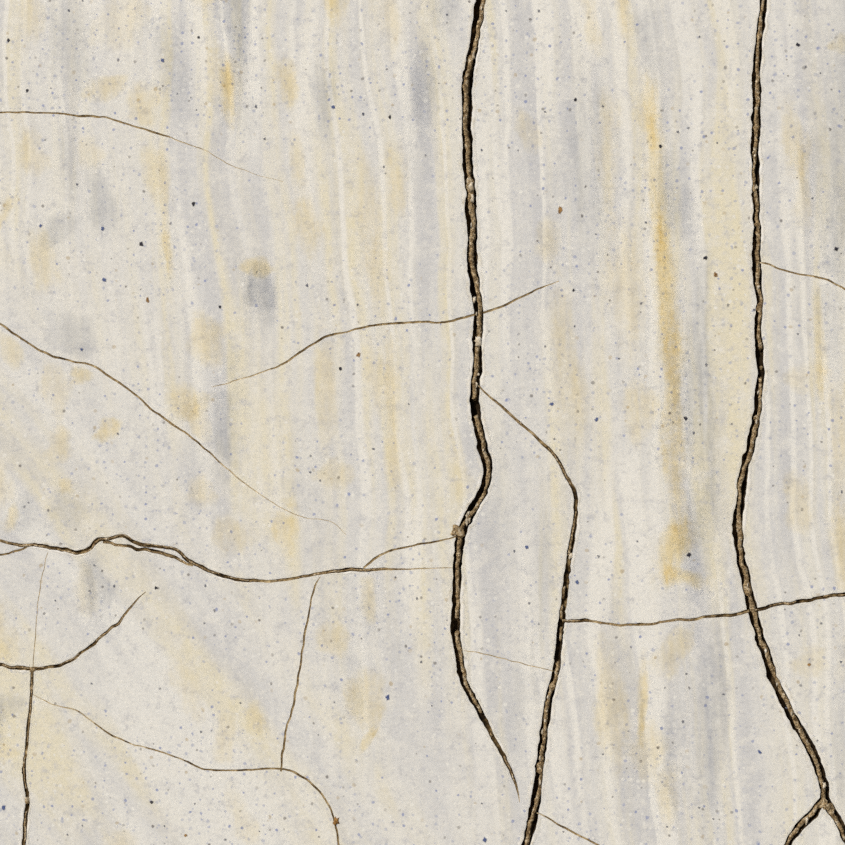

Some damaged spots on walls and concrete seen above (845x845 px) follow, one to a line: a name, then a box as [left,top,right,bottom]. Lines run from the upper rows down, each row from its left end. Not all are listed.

crack [0,577,339,845]
crack [0,0,559,802]
crack [478,0,845,845]